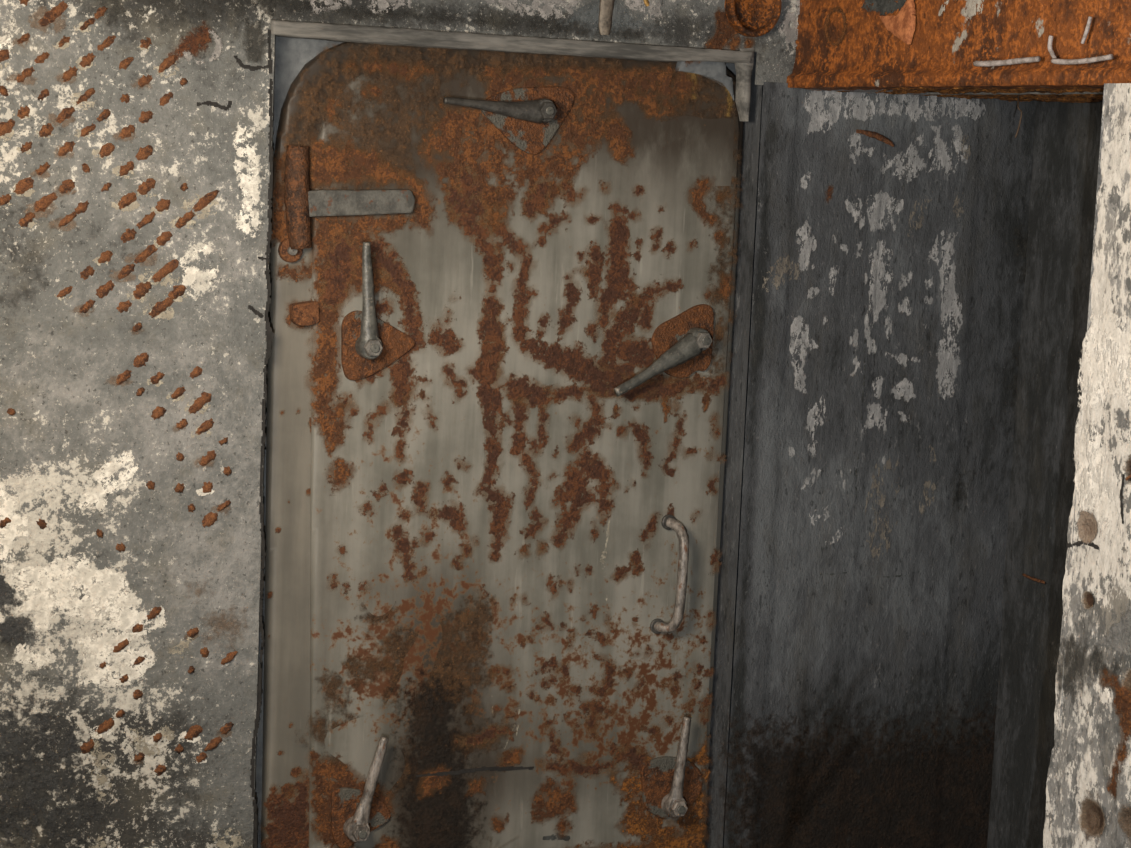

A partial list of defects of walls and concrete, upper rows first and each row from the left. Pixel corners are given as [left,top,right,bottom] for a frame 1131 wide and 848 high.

corrosion [705,10,753,51]
corrosion [879,0,916,44]
corrosion [0,0,219,334]
peeling [803,90,986,183]
corrosion [271,44,740,583]
peeling [762,190,963,434]
corrosion [109,353,232,476]
peeling [789,316,826,495]
corrosion [174,481,231,528]
leakage [0,563,37,645]
corrosion [261,584,714,848]
corrosion [1101,669,1131,837]